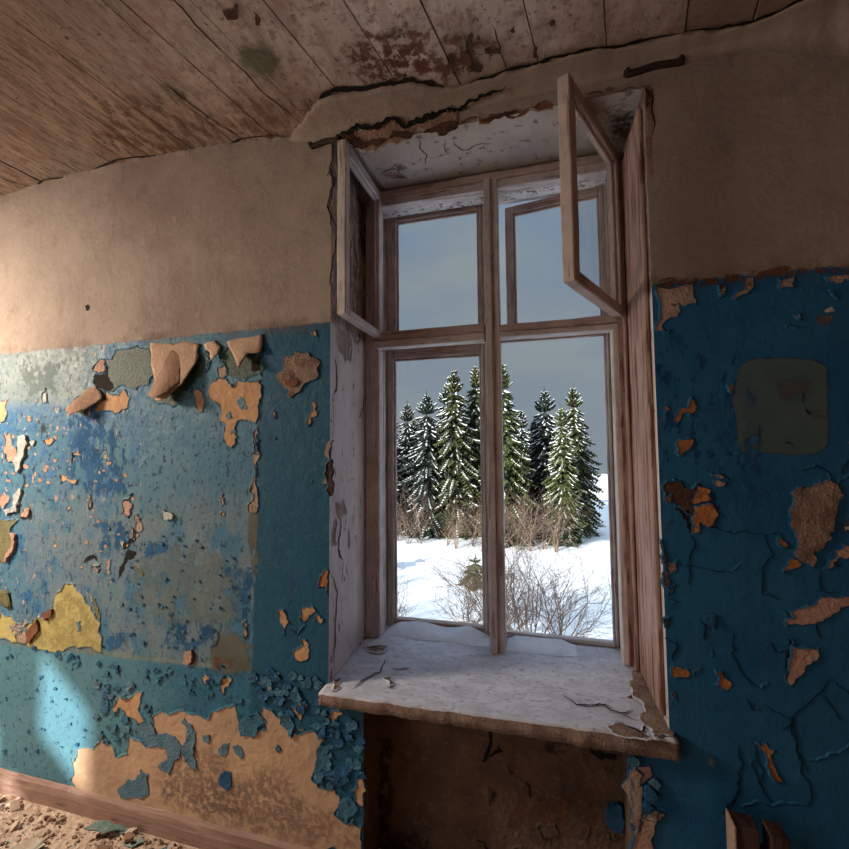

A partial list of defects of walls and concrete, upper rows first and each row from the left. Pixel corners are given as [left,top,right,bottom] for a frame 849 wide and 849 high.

spalling [340,100,553,153]
crack [316,0,803,164]
peeling [0,399,57,482]
peeling [193,362,263,515]
spalling [660,472,729,535]
crack [677,520,781,601]
spalling [776,479,849,574]
crack [354,646,406,687]
peeling [782,594,849,687]
peeling [71,691,364,849]
crack [563,695,646,732]
crack [722,633,849,815]